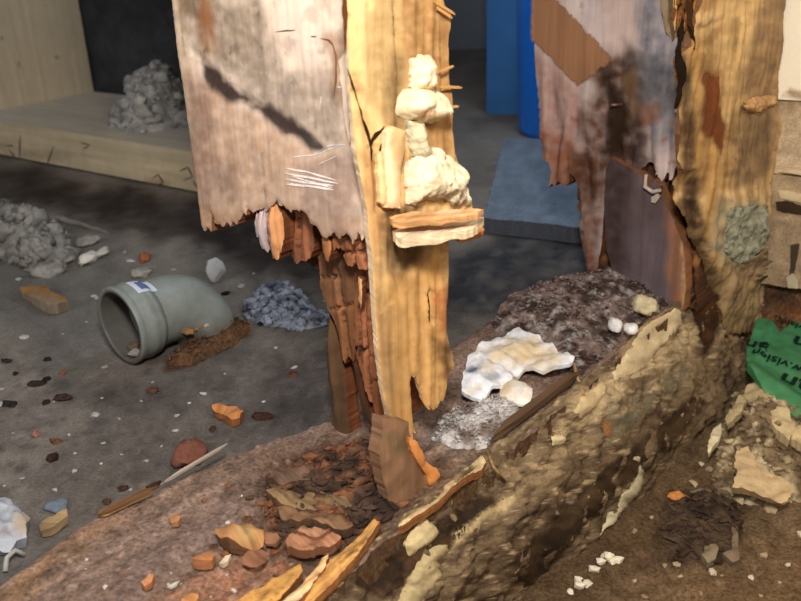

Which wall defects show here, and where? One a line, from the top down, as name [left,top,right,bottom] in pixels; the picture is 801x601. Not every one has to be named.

water stain [204,65,323,149]
crack [311,0,385,162]
water stain [531,0,627,157]
spalling [776,189,801,215]
spalling [786,243,800,288]